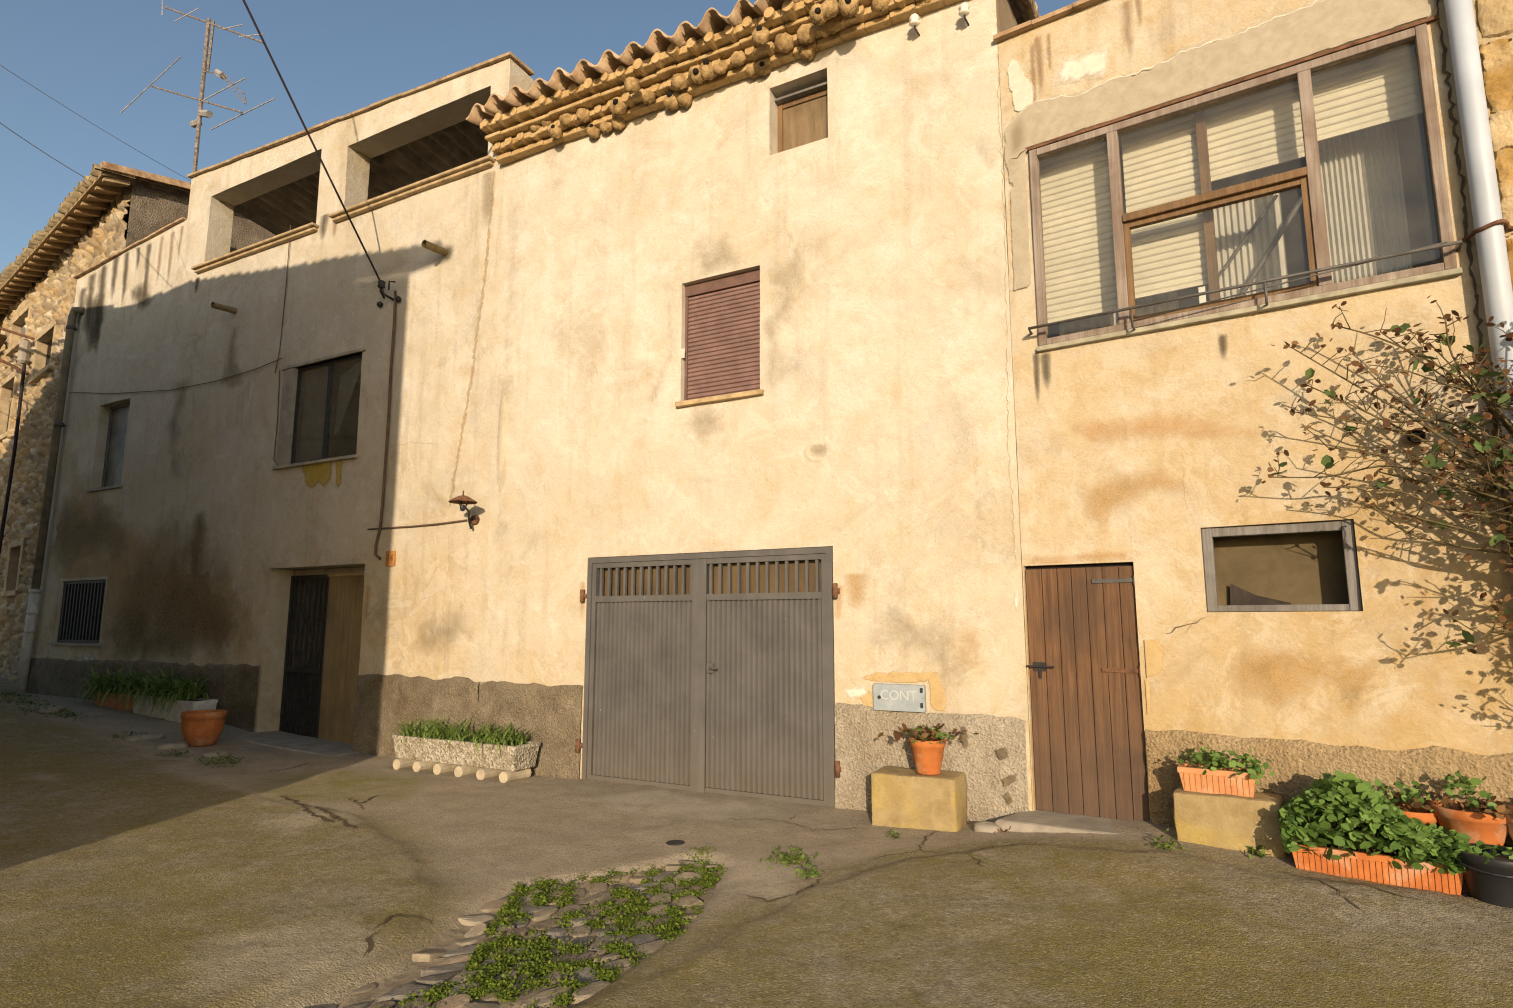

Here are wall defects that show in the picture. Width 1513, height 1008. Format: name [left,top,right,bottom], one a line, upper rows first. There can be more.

peeling [997,55,1035,119]
peeling [1060,51,1107,81]
damp [78,244,150,344]